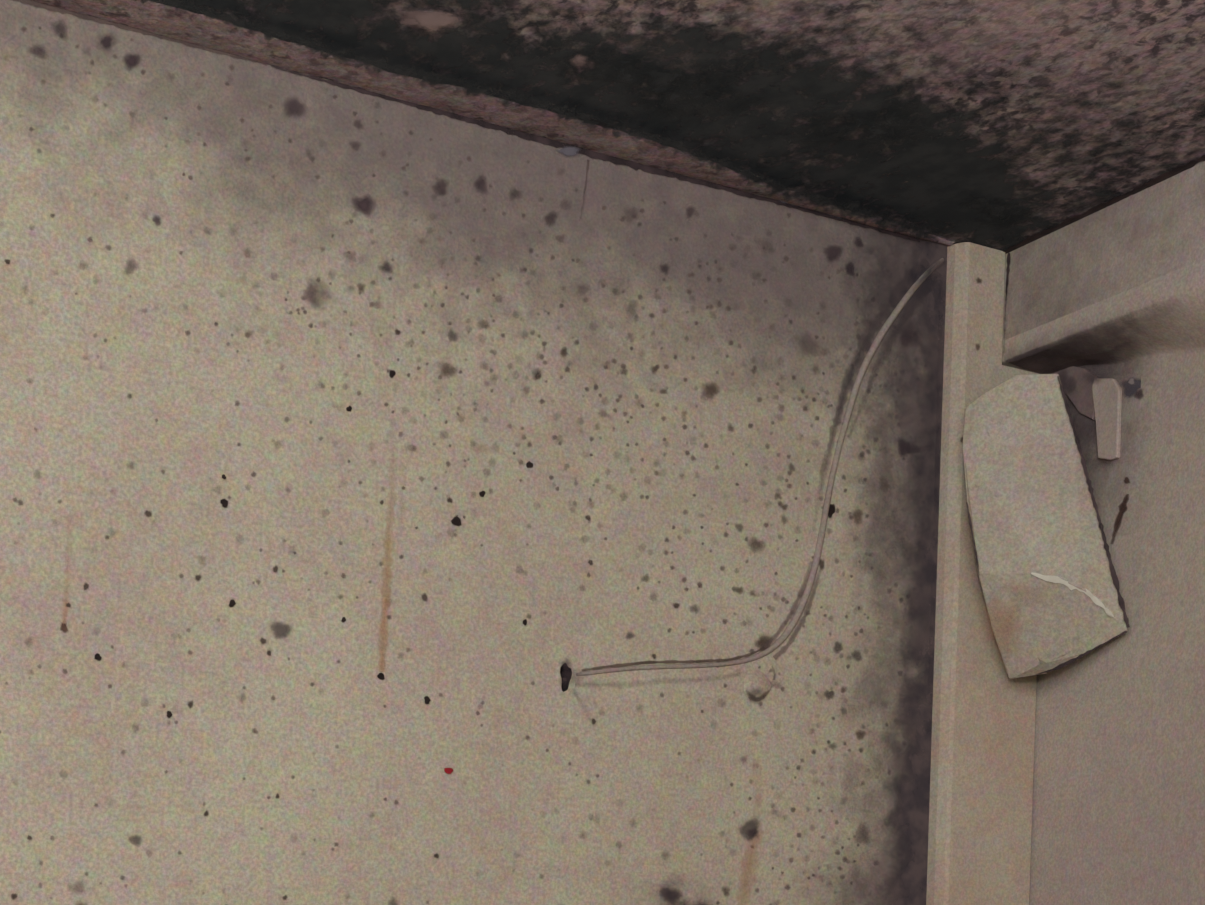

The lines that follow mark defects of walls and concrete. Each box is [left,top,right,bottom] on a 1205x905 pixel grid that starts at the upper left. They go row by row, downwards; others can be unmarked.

water stain [125,55,145,74]
water stain [350,197,372,223]
water stain [828,504,868,521]
water stain [663,889,701,905]